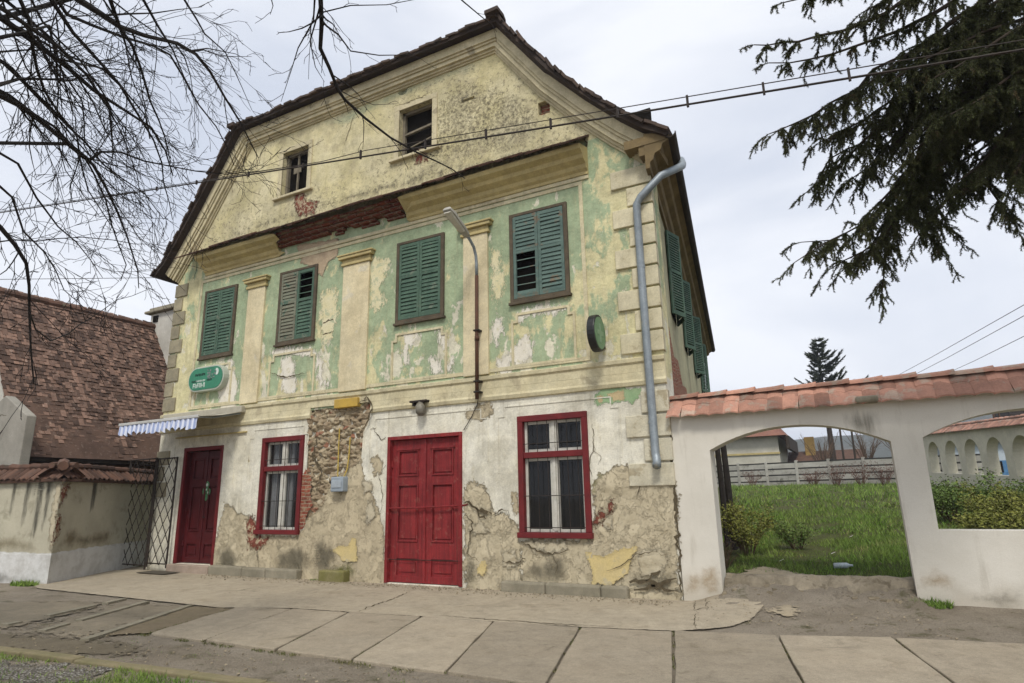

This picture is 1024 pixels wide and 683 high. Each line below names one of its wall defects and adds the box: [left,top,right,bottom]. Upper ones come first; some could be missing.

peeling [270,285,340,394]
peeling [401,329,455,380]
peeling [489,247,571,374]
peeling [213,454,385,583]
crack [464,501,567,573]
peeling [462,461,684,601]
crack [607,435,682,592]